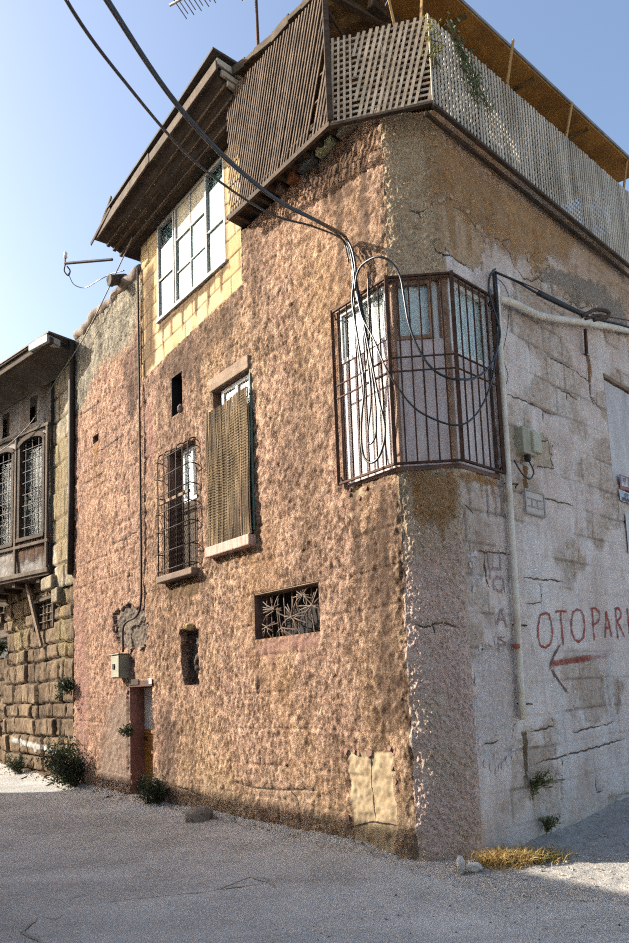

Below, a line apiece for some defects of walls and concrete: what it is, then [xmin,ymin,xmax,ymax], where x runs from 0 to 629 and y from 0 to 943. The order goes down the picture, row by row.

peeling [430,194,488,270]
crack [21,877,276,943]